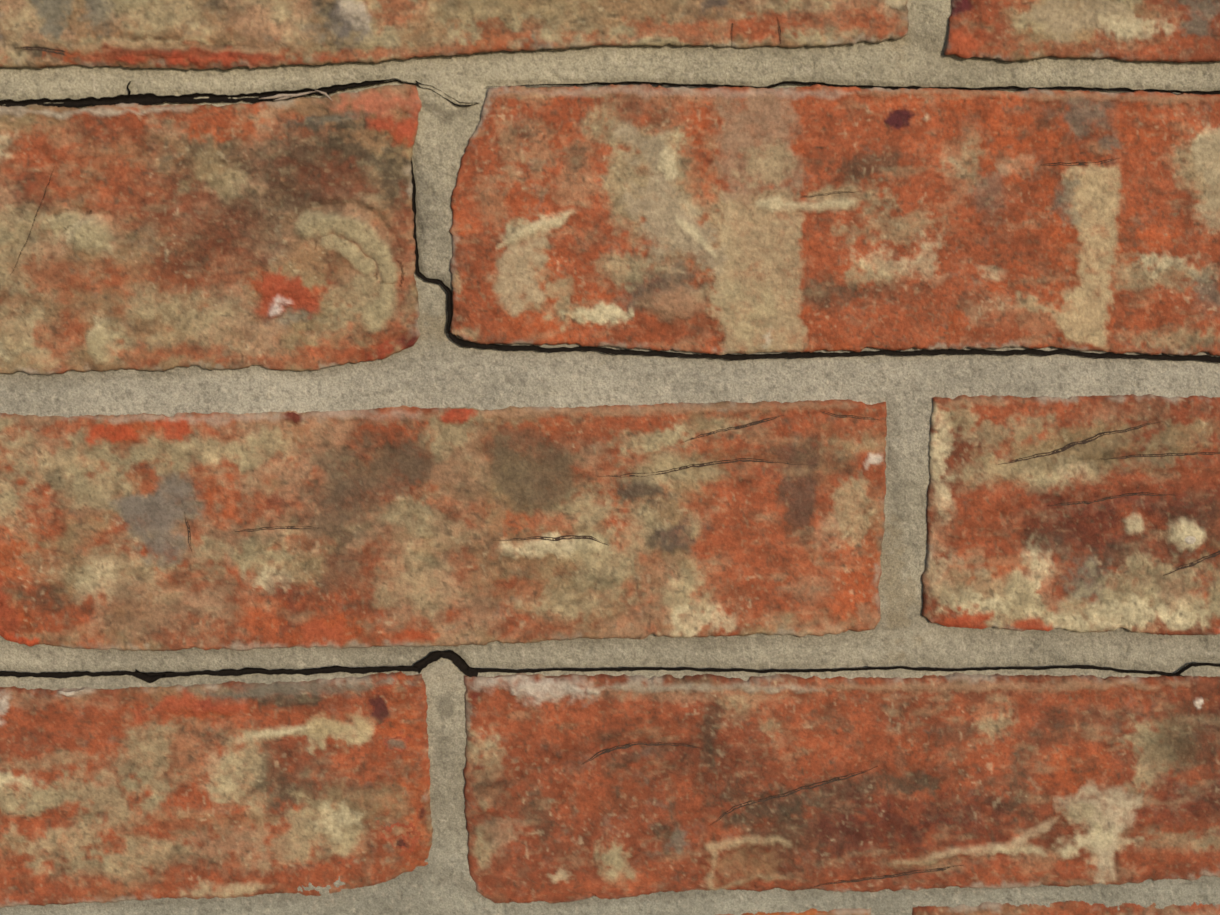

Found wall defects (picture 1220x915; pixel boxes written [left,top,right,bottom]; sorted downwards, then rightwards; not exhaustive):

crack [0,78,1220,108]
crack [411,158,501,349]
crack [0,650,1220,683]